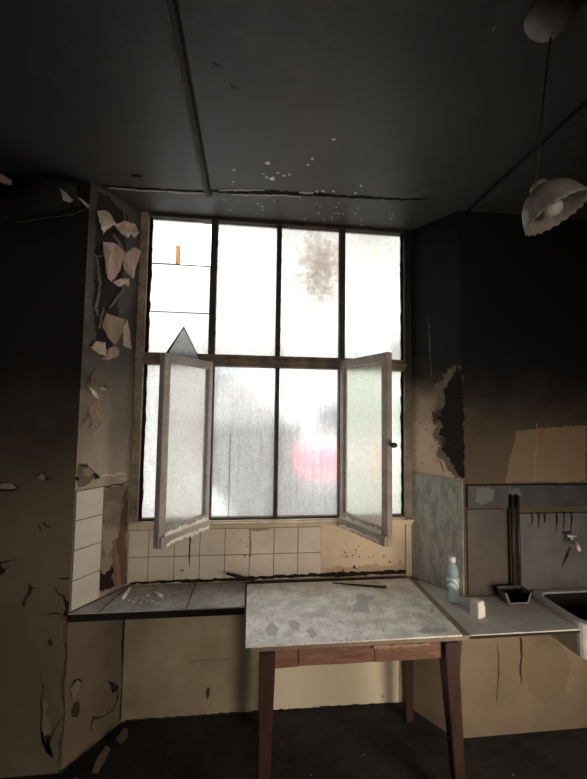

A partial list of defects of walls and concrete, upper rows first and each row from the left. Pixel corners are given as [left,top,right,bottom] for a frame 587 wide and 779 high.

crack [101,185,430,201]
peeling [219,188,314,197]
flaking render [60,187,204,360]
flaking render [76,463,129,593]
crack [0,560,13,576]
crack [22,583,35,607]
crack [40,577,82,766]
crack [91,692,119,732]